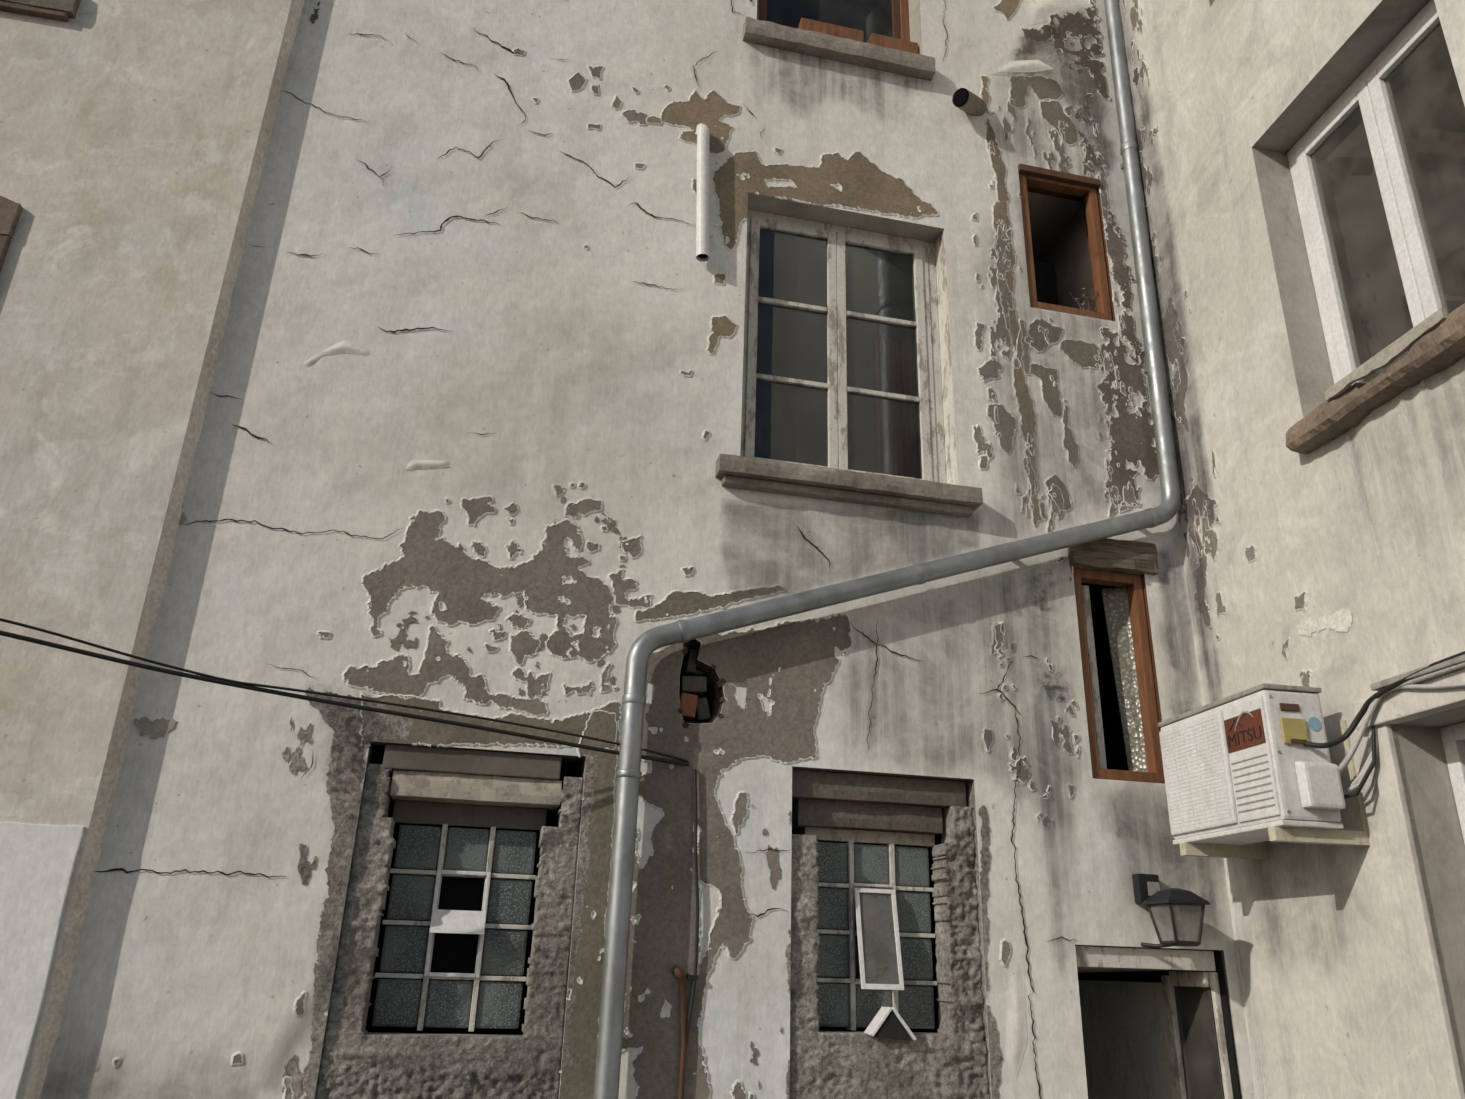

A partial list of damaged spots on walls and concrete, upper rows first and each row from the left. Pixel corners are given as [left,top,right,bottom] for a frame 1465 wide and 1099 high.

crack [251,209,559,257]
crack [377,325,454,333]
crack [346,28,721,227]
peeling [705,315,738,356]
peeling [567,65,939,251]
peeling [970,0,1163,534]
crack [189,519,402,539]
peeling [1177,449,1228,641]
crack [95,868,286,878]
peeling [282,481,787,1099]
peeling [621,612,853,1099]
crack [976,655,1078,1099]